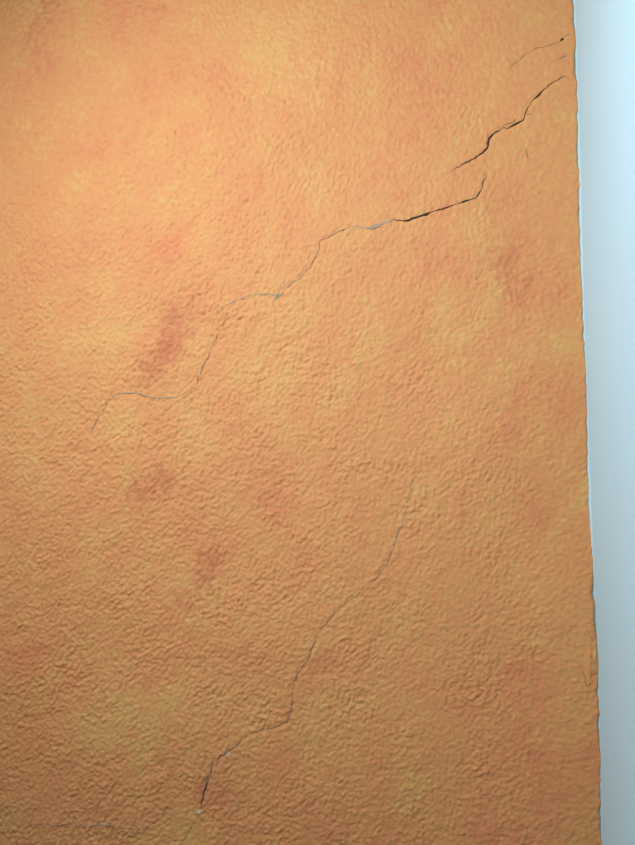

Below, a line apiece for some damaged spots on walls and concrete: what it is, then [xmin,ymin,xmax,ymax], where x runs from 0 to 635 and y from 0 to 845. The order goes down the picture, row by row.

crack [444,34,569,176]
crack [91,179,485,431]
crack [180,476,414,845]
crack [27,801,170,834]